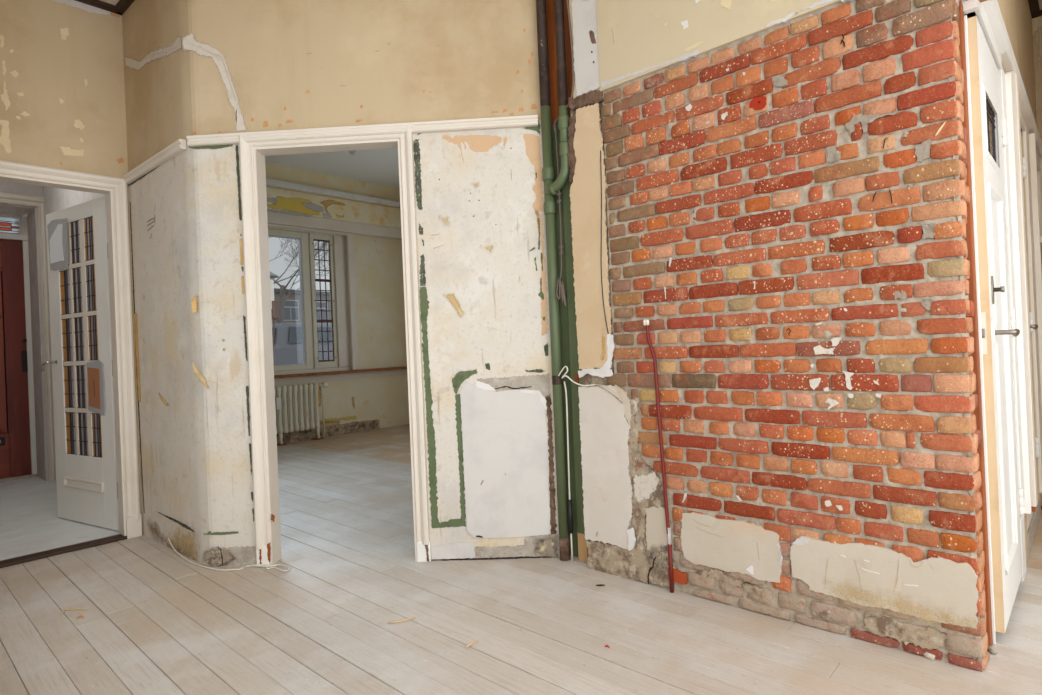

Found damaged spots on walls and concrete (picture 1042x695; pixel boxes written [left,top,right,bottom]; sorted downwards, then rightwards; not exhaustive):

peeling [0,34,30,153]
crack [125,33,246,131]
peeling [442,135,508,160]
peeling [267,196,345,218]
peeling [201,542,271,567]